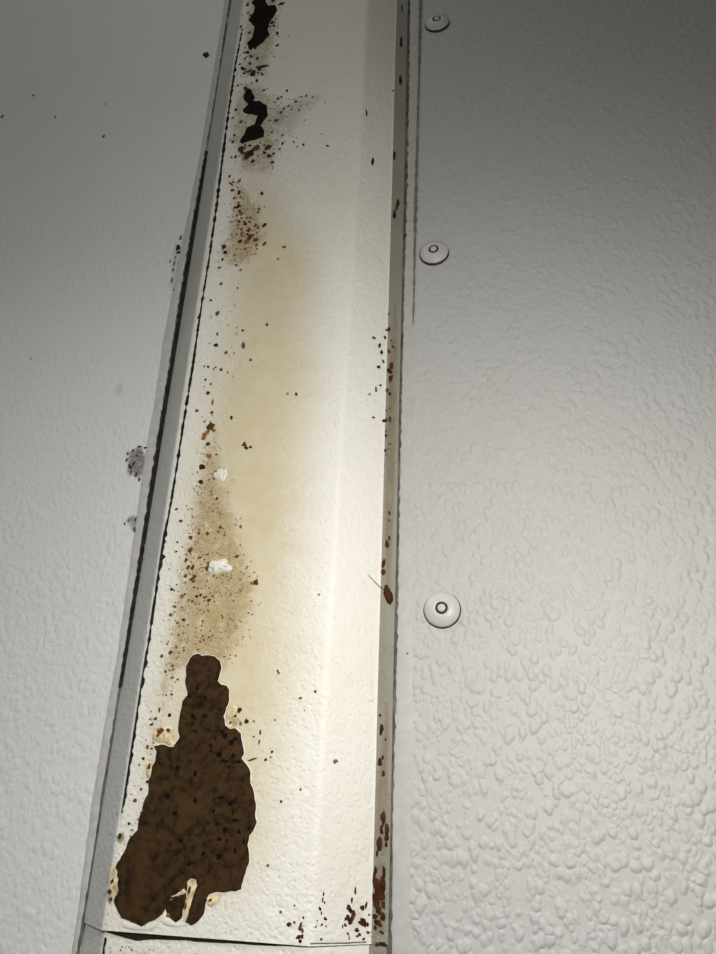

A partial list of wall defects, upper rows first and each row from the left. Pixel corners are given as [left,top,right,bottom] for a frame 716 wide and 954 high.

corrosion [217,0,289,271]
corrosion [369,327,394,466]
water stain [205,237,293,759]
corrosion [368,535,393,605]
corrosion [342,810,389,946]